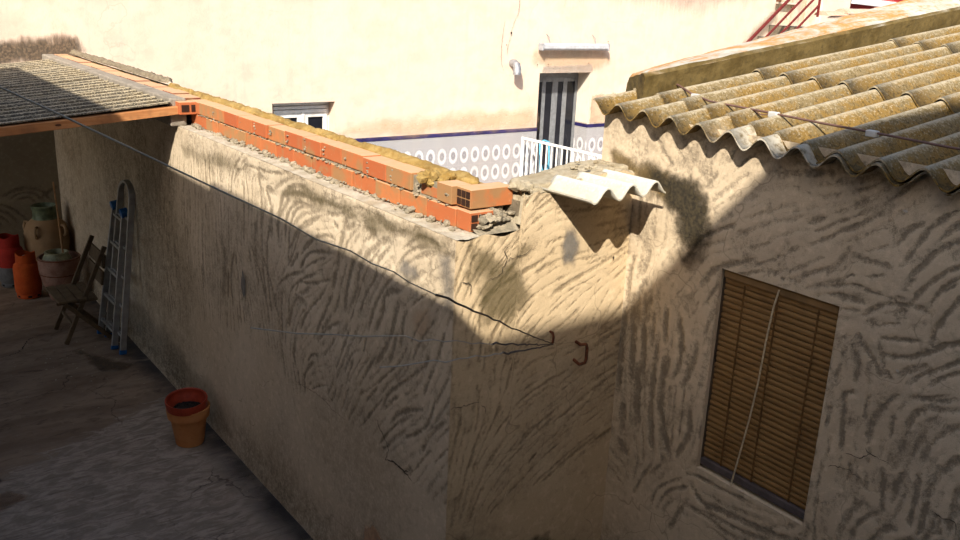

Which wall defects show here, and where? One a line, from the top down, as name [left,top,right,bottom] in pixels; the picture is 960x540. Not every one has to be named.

mould [0,36,81,64]
mould [651,170,712,249]
leakage [477,253,527,321]